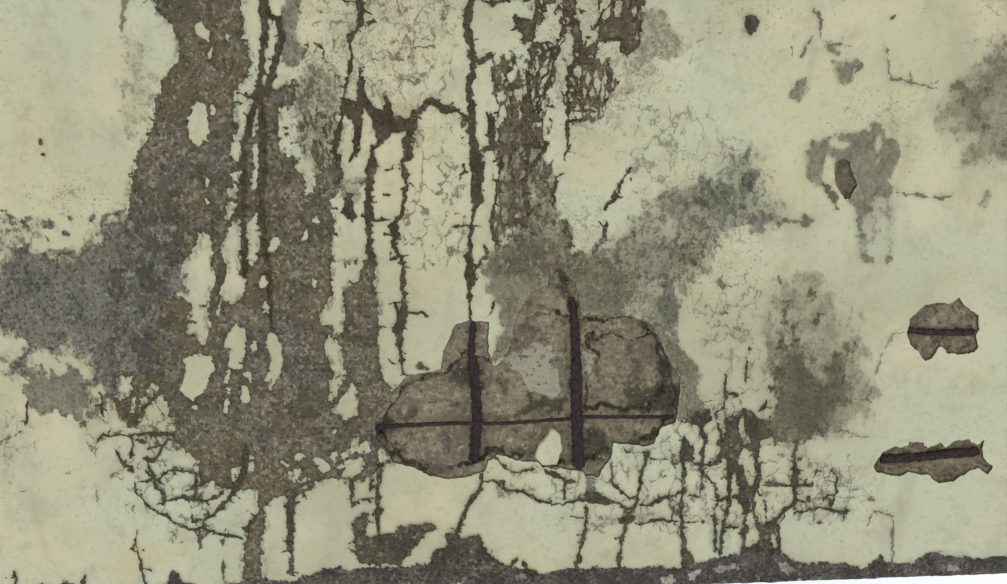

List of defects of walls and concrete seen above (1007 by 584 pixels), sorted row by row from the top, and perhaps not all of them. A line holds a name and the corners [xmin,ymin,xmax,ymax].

crack [235,0,325,332]
crack [321,0,511,376]
water stain [480,0,750,421]
water stain [807,123,900,264]
spalling [907,298,980,361]
crack [84,382,257,584]
peeling [281,492,297,553]
water stain [286,541,299,576]
spalling [347,262,682,576]
crack [451,437,684,571]
water stain [794,467,858,522]
spalling [874,439,993,483]